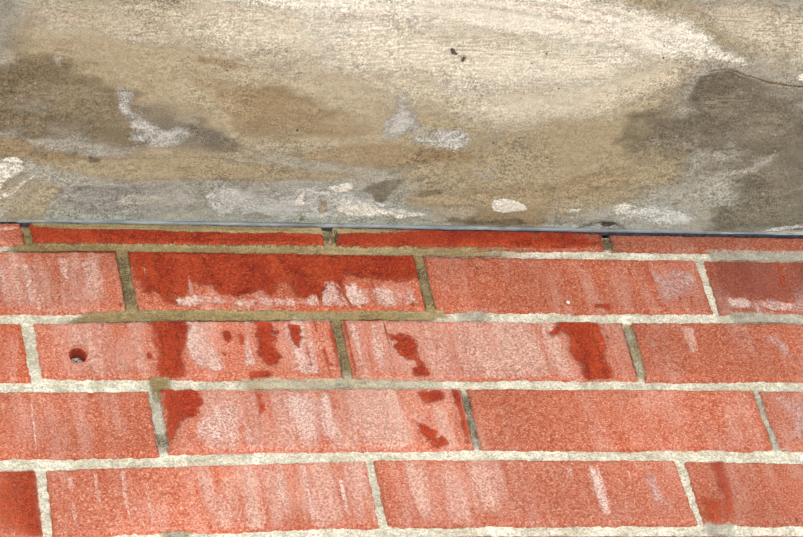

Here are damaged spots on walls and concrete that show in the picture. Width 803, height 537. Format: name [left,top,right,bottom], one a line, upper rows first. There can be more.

water stain [0,0,803,232]
water stain [0,183,614,449]
water stain [624,327,645,377]
water stain [682,328,695,352]
water stain [710,250,803,324]
water stain [755,395,778,448]